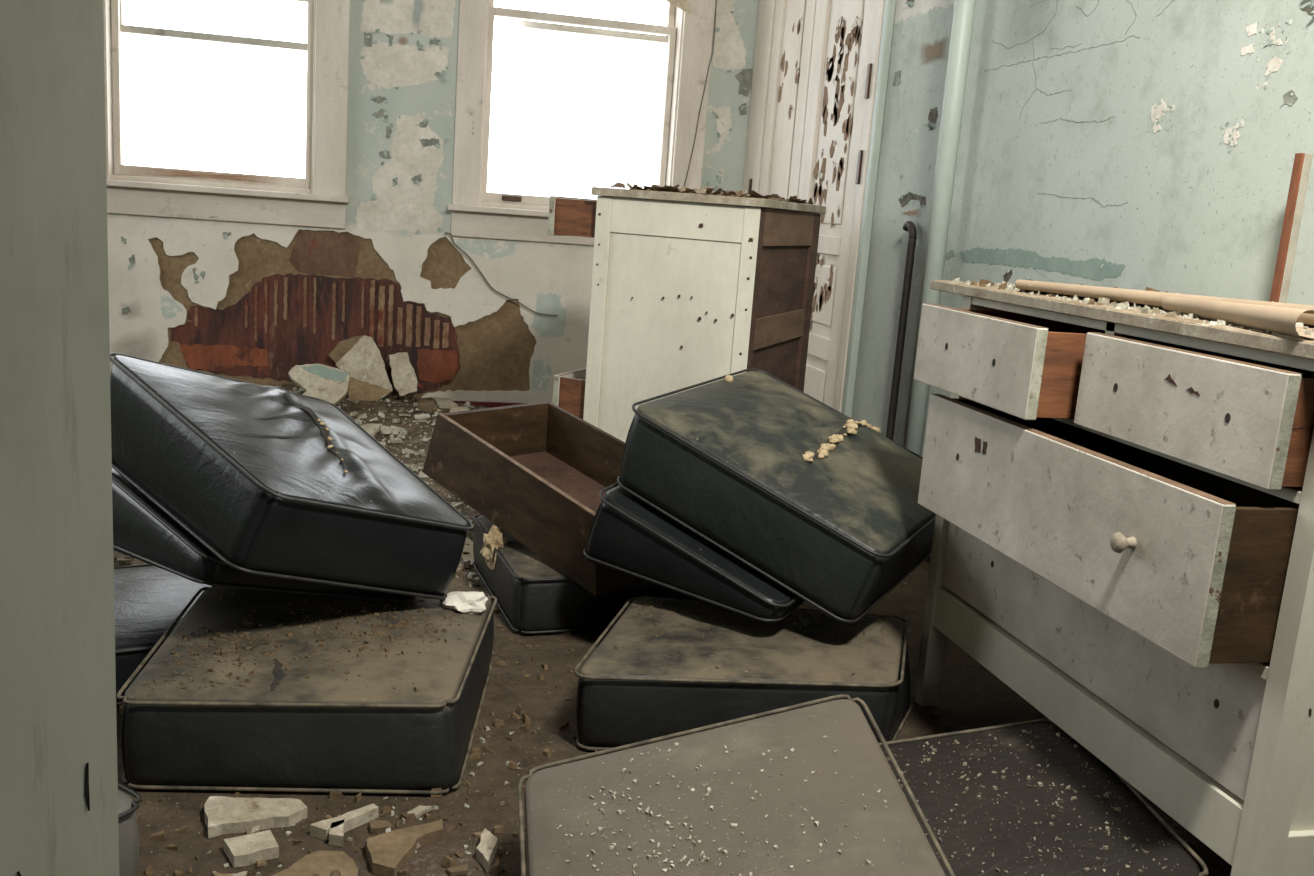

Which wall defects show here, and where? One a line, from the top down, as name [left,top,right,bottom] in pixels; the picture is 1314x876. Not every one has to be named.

peeling [1241,0,1314,90]
peeling [596,0,862,228]
peeling [1281,90,1298,106]
flaking render [148,0,537,398]
peeling [809,254,833,332]